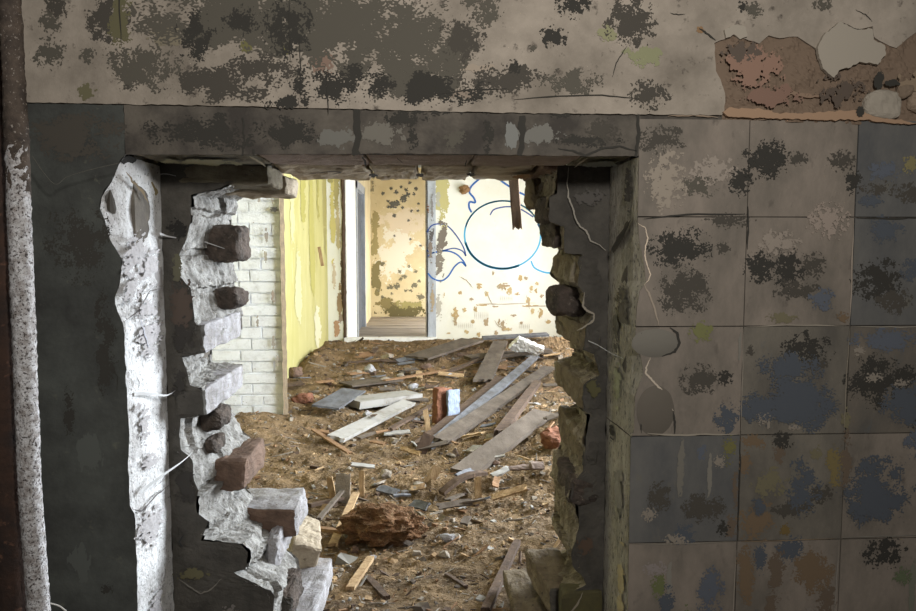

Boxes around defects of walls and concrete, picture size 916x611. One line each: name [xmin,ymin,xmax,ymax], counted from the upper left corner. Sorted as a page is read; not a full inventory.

damp [79,0,603,154]
damp [603,0,659,48]
spalling [714,22,916,125]
spalling [105,190,116,214]
spalling [172,165,298,415]
damp [370,172,420,266]
damp [436,220,448,282]
spalling [447,177,602,350]
mould [645,212,757,318]
mould [682,139,809,199]
spalling [556,360,601,506]
spalling [175,365,333,611]